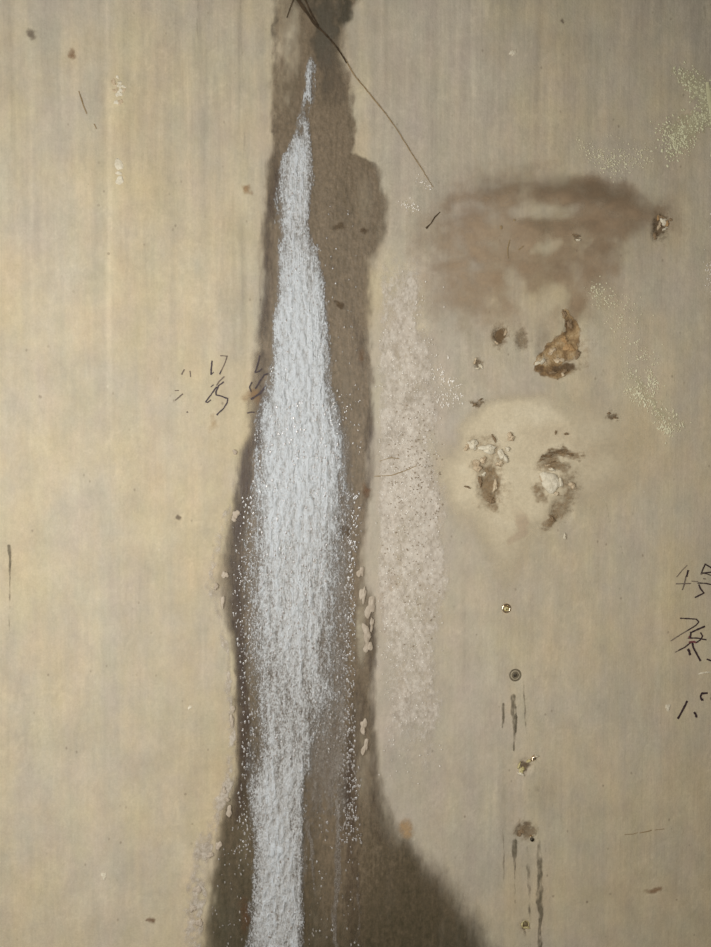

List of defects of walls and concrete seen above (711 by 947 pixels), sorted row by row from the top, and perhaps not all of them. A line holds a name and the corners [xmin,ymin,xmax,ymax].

damp [443,178,664,317]
spalling [534,309,581,379]
damp [186,0,479,947]
spalling [464,432,515,510]
spalling [534,447,584,527]